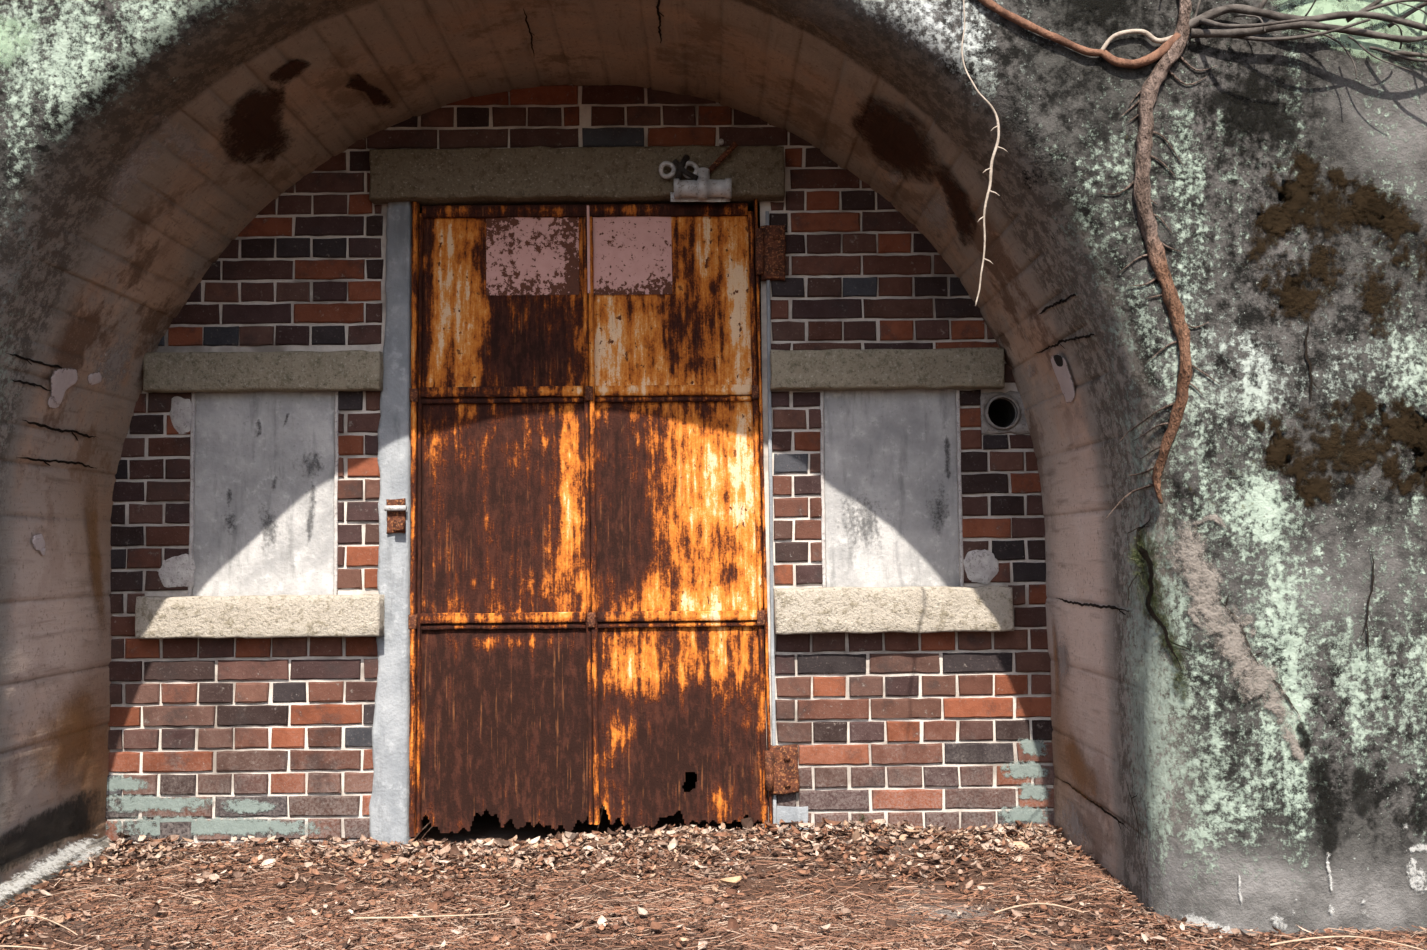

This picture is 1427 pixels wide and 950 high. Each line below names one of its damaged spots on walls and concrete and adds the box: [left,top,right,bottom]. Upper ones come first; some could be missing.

crack [656,0,664,43]
damp [107,59,311,208]
damp [346,74,393,108]
damp [852,98,977,246]
crack [1037,294,1094,353]
crack [6,353,96,468]
crack [1058,516,1191,669]
damp [0,791,102,901]
damp [1297,721,1378,914]
damp [1394,806,1427,890]